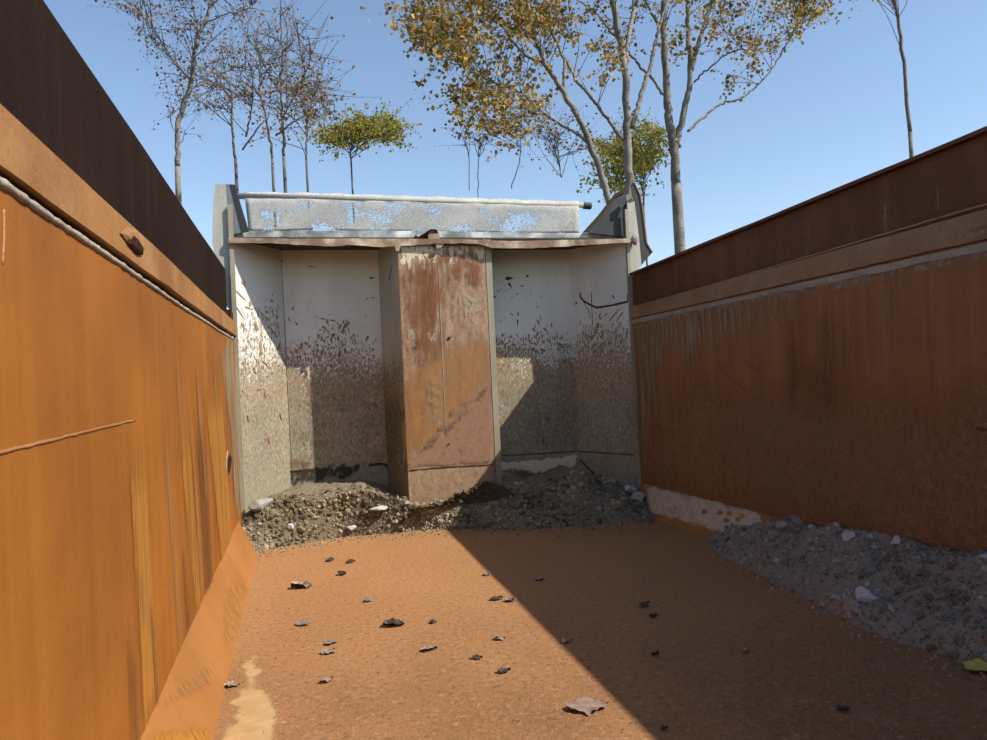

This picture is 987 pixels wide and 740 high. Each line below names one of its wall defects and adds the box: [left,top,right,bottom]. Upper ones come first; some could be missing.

rust [400,252,481,354]
rust [207,394,231,559]
rust [131,468,156,721]